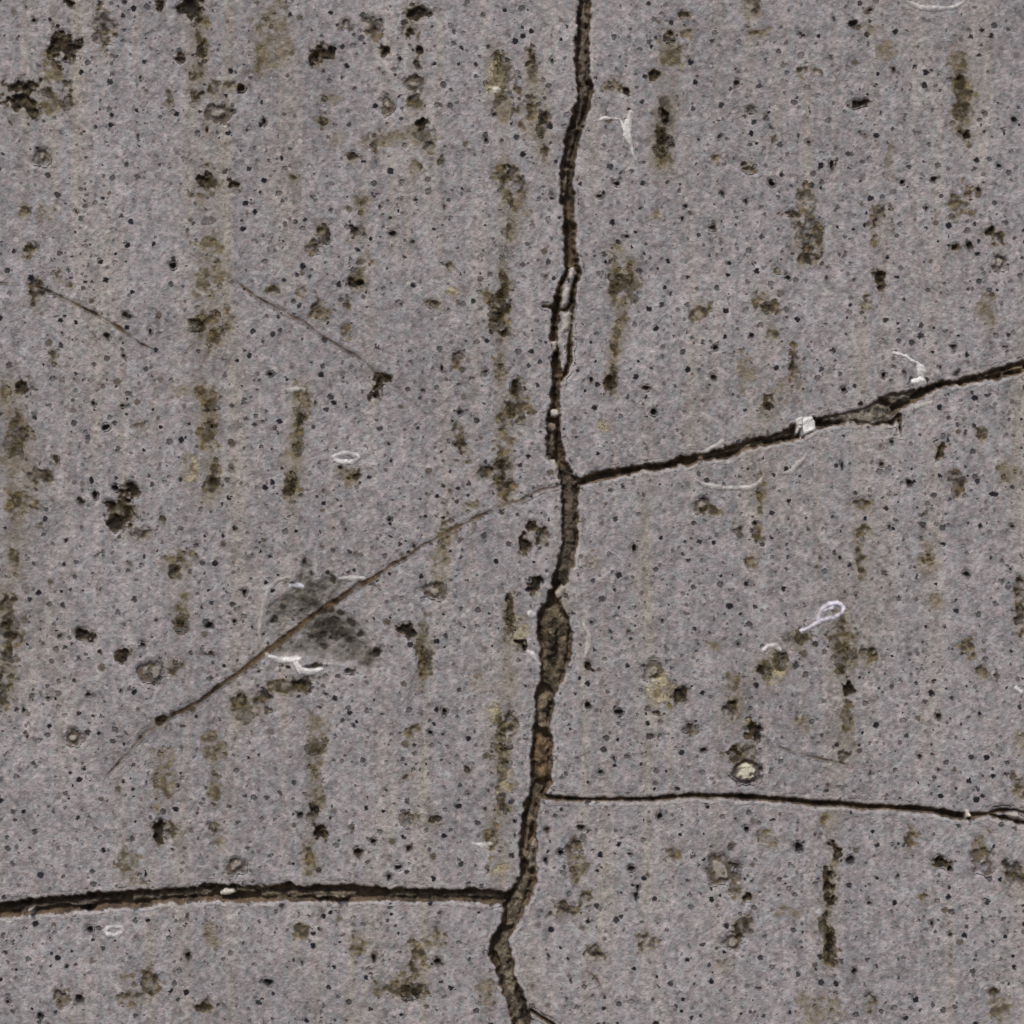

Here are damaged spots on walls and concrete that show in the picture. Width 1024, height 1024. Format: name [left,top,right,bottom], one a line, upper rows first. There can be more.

crack [0,280,160,352]
crack [225,273,428,415]
crack [482,0,1024,1024]
crack [106,484,560,776]
crack [0,876,511,924]